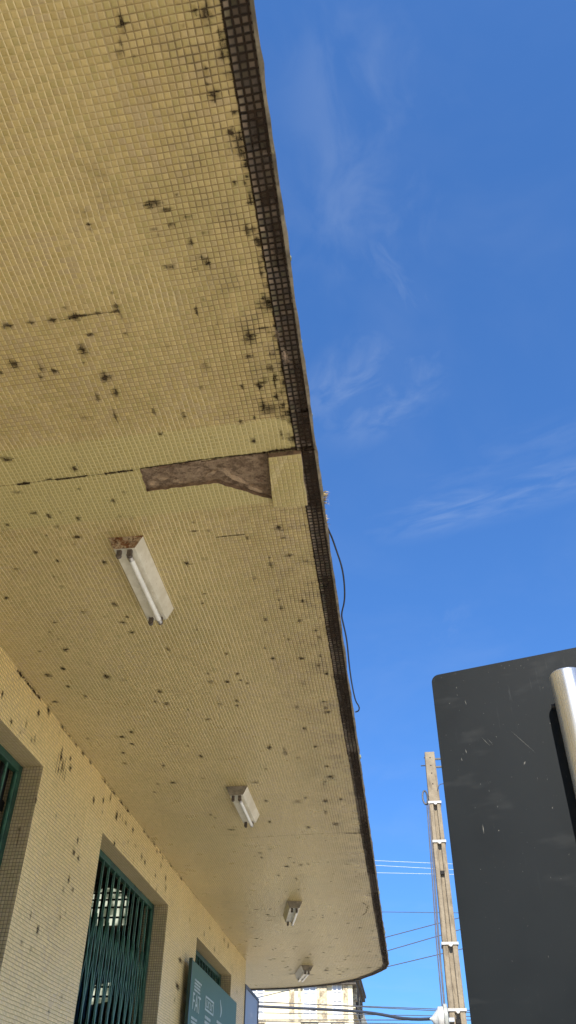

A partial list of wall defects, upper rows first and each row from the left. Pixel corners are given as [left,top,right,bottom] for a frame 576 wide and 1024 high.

crack [55,446,314,481]
spalling [141,452,272,496]
leakage [194,0,388,990]